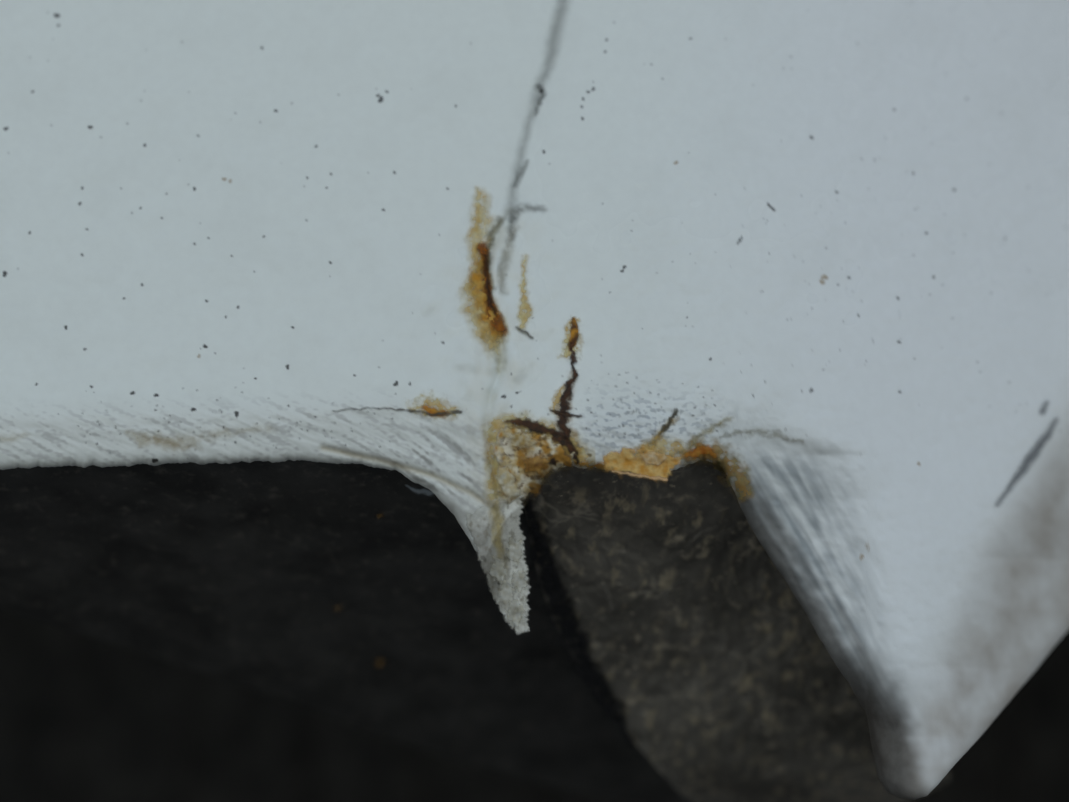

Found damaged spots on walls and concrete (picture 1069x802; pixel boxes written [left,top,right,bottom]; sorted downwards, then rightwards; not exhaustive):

rust [464,191,533,349]
rust [411,399,456,416]
crack [505,348,582,464]
rust [576,409,753,500]
peeling [467,415,589,634]